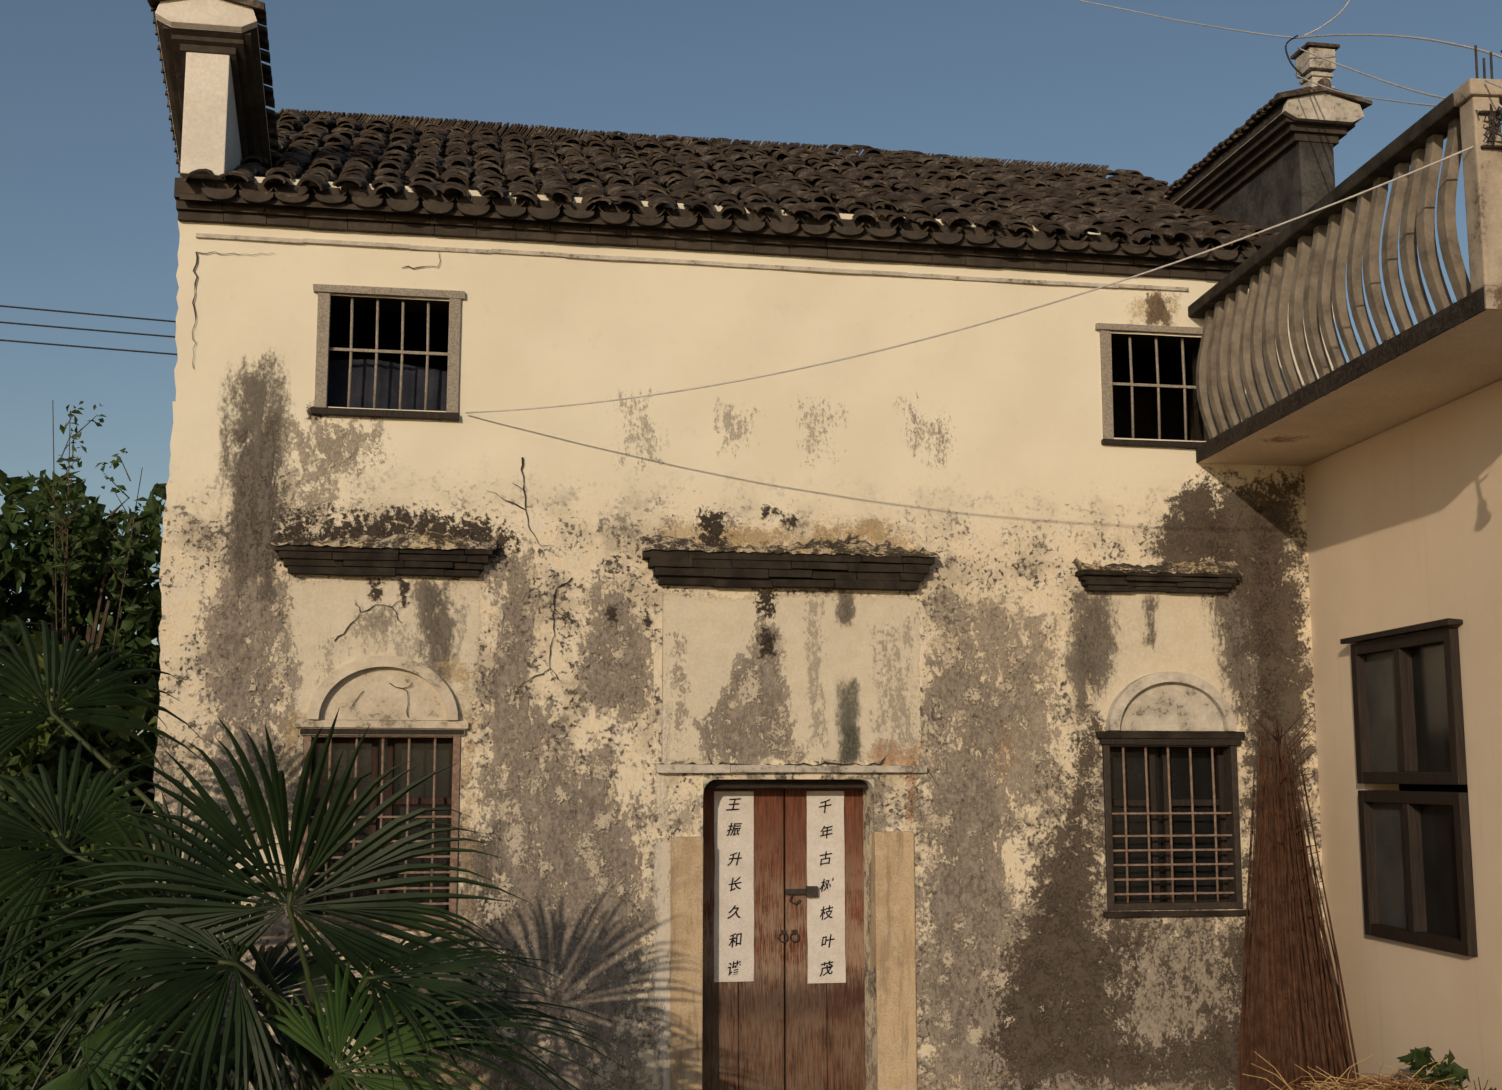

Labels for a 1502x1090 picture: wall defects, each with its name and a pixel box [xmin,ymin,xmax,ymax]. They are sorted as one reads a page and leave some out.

leakage [219,351,522,681]
leakage [653,491,734,547]
leakage [760,501,797,530]
leakage [820,515,896,554]
leakage [753,588,782,620]
leakage [836,589,856,625]
leakage [1142,595,1158,647]
peeling [562,575,810,765]
leakage [1065,591,1121,716]
leakage [836,680,861,764]
peeling [462,531,659,1090]